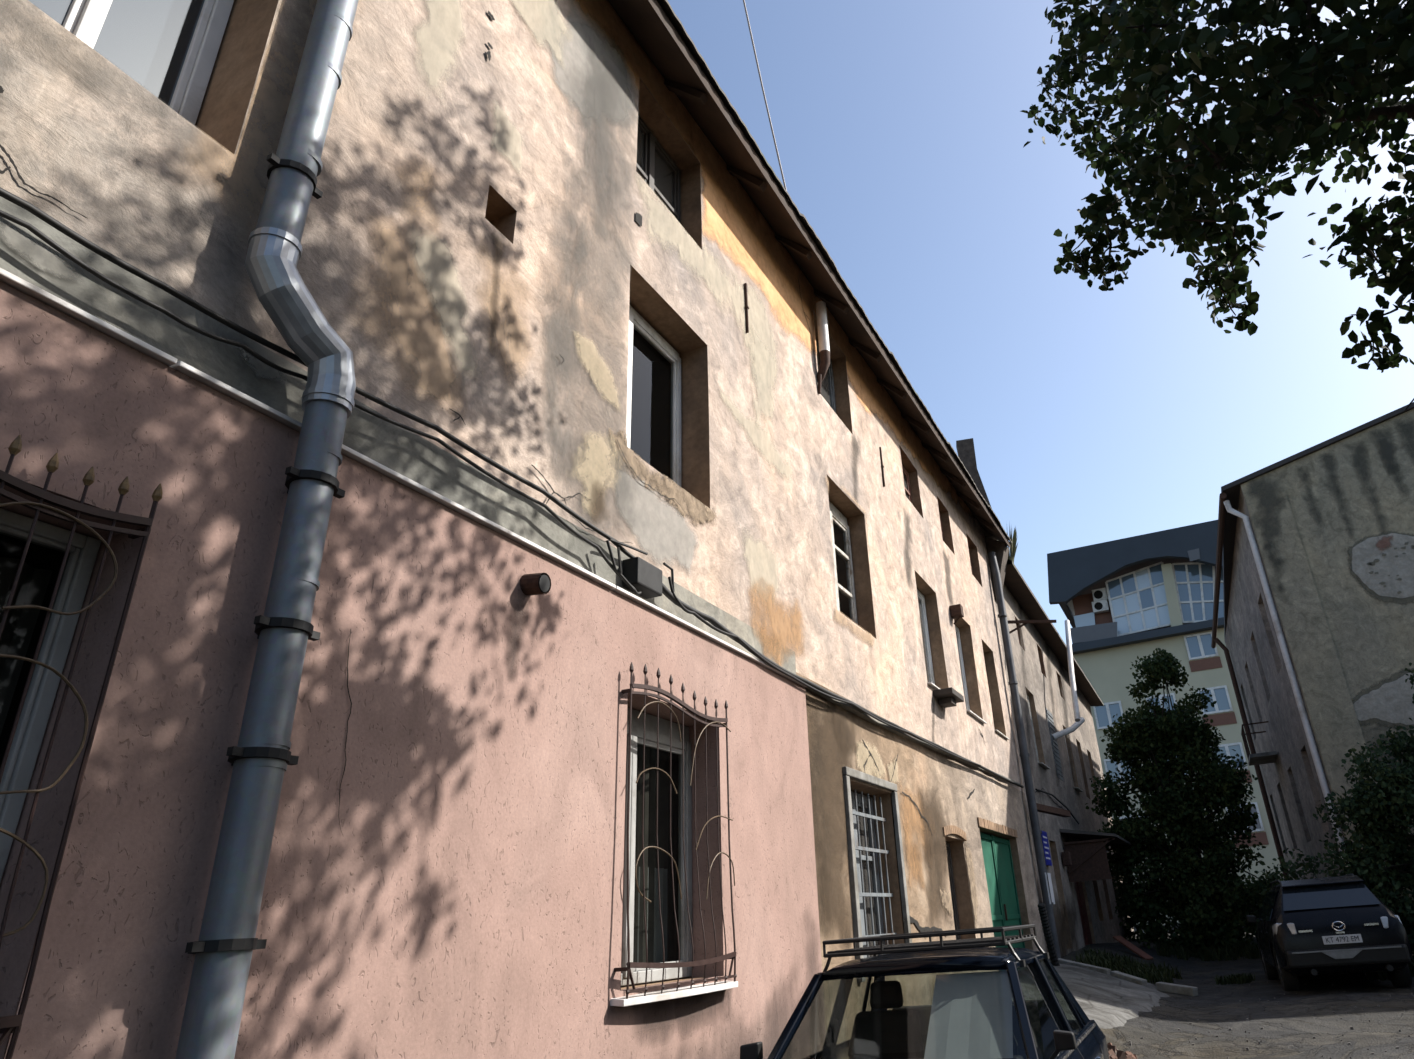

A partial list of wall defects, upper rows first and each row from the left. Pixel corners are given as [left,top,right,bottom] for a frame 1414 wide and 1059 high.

crack [0,144,88,219]
peeling [575,0,972,525]
water stain [1354,424,1414,521]
water stain [1250,481,1283,568]
spalling [1348,532,1414,605]
crack [338,629,352,835]